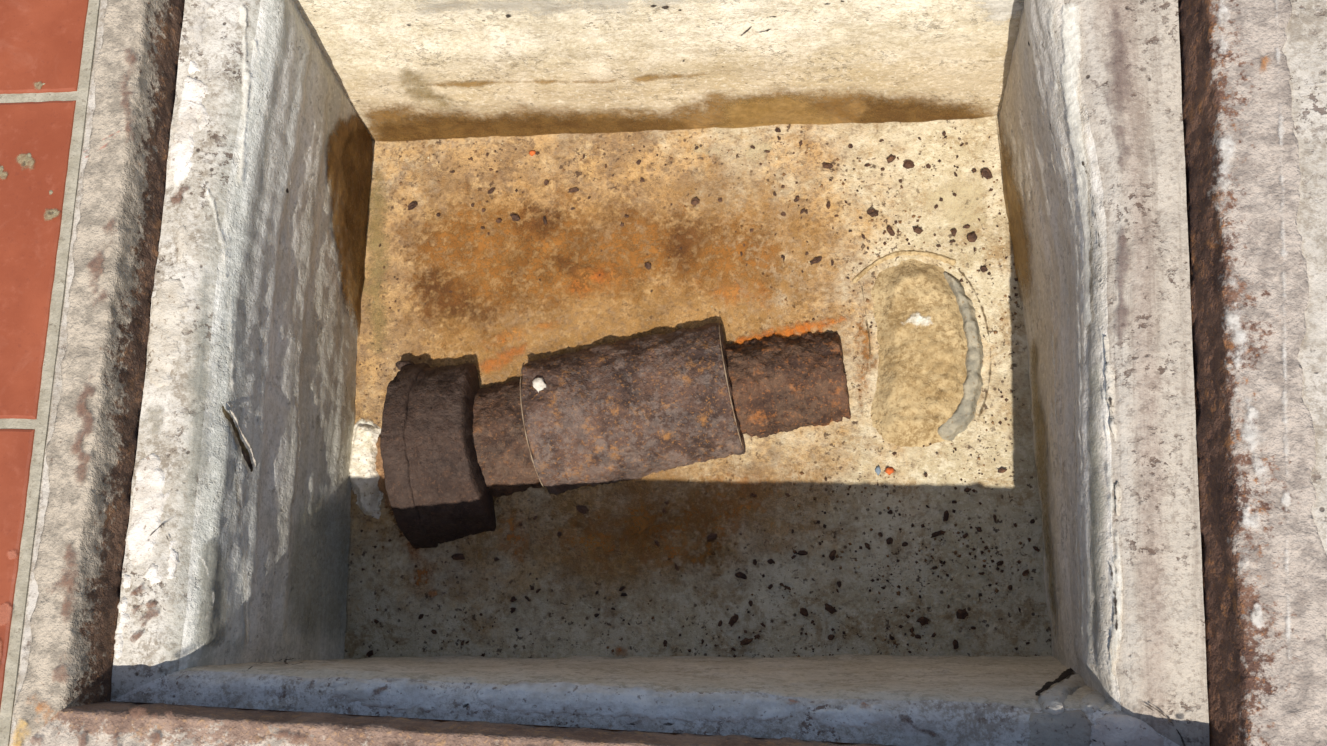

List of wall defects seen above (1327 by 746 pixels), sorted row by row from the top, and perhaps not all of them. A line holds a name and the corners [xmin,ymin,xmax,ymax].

water stain [238,6,261,183]
water stain [206,190,234,390]
corrosion [406,204,877,397]
water stain [315,72,991,336]
water stain [998,134,1043,298]